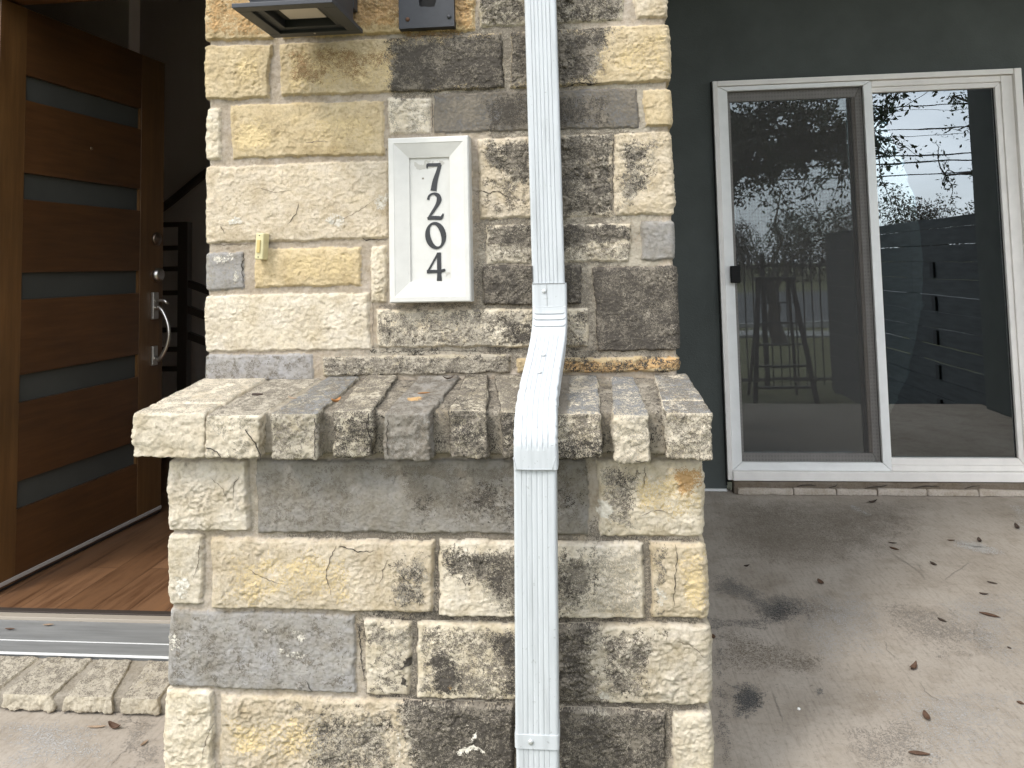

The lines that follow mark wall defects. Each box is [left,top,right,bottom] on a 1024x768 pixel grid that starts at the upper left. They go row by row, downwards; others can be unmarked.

crack [326,546,388,594]
leakage [209,0,533,768]
leakage [557,0,825,768]